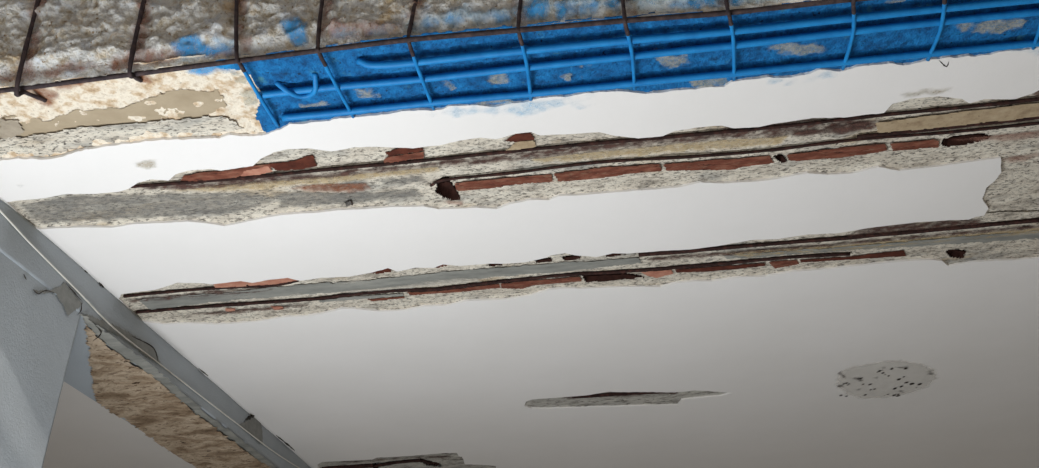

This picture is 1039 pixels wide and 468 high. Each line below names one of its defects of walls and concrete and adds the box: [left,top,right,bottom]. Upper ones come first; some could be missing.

spalling [0,0,1039,158]
spalling [10,91,1039,323]
spalling [33,282,277,468]
spalling [318,453,496,468]
spalling [525,390,725,407]